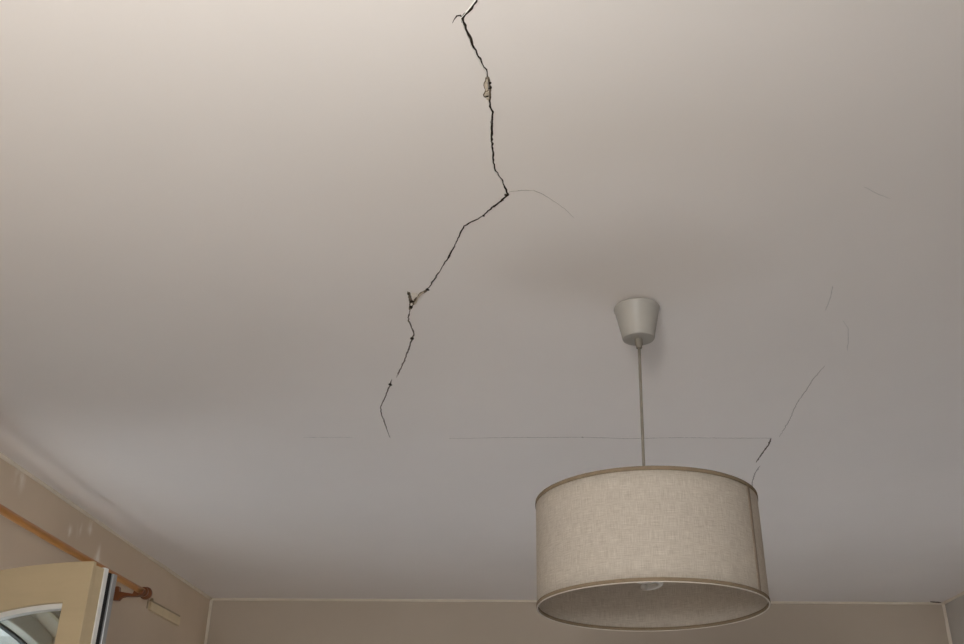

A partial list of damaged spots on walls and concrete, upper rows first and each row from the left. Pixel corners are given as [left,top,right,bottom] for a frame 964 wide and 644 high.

crack [426,0,574,291]
crack [380,311,415,437]
crack [752,367,824,486]